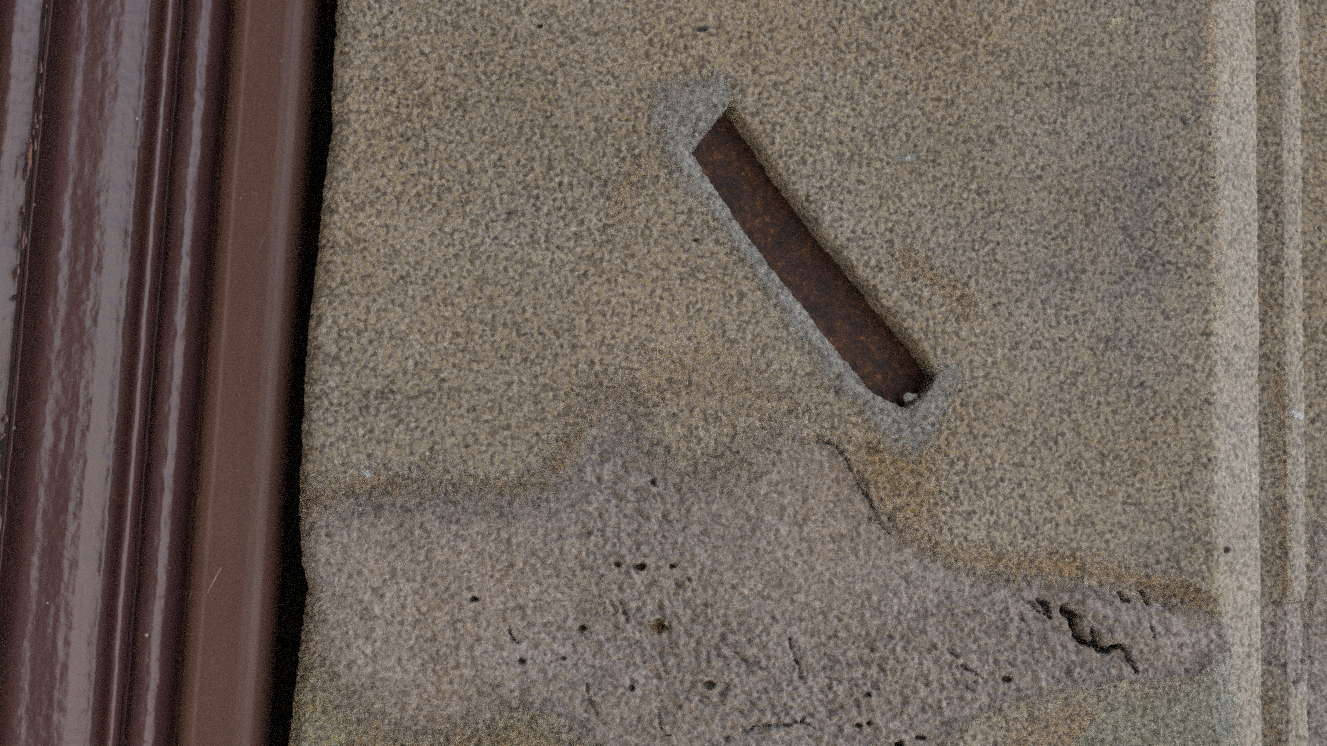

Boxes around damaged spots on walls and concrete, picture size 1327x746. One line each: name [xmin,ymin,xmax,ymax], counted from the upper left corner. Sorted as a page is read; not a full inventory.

spalling [299,381,1229,746]
crack [1034,598,1133,668]